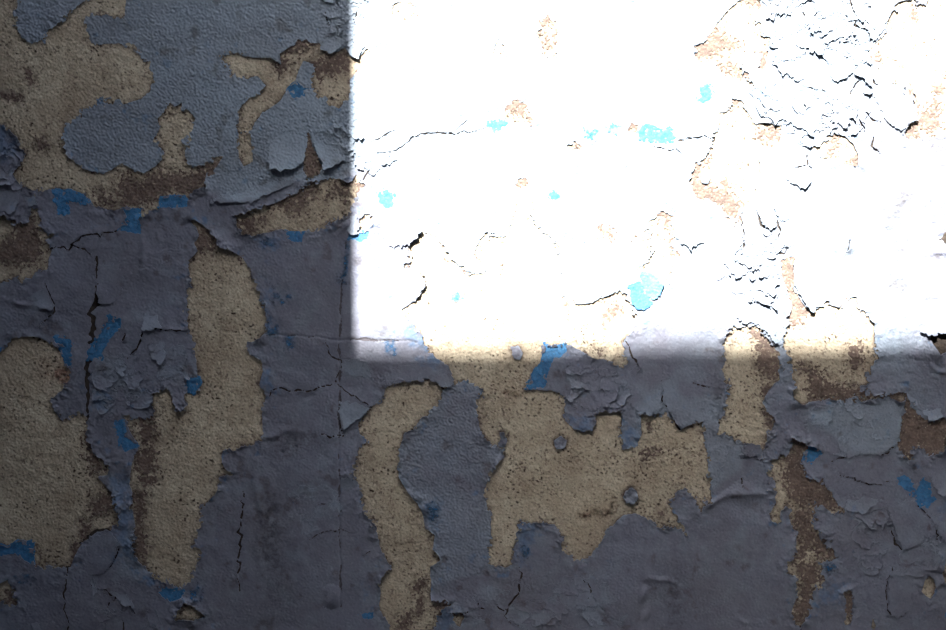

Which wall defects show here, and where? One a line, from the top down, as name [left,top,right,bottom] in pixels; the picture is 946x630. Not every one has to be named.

peeling [0,0,223,284]
peeling [207,0,399,285]
crack [363,119,486,181]
peeling [0,334,119,607]
peeling [86,219,295,621]
crack [236,493,245,592]
crack [266,242,406,607]
peeling [338,0,946,630]
crack [885,530,906,617]